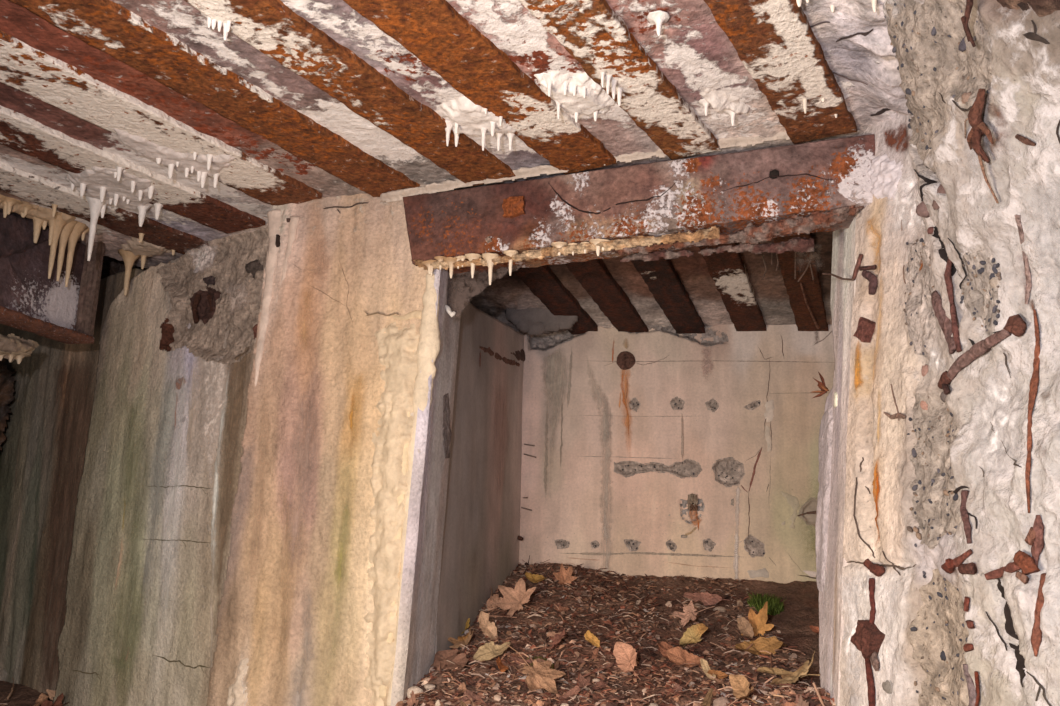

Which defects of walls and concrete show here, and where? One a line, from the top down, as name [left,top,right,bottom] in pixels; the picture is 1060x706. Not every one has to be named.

damp [438,94,516,151]
damp [528,68,625,123]
damp [380,165,569,202]
rust [550,182,676,214]
damp [0,166,175,296]
rust [931,214,1048,657]
crack [149,485,213,493]
spalling [614,457,745,506]
spalling [666,499,705,552]
crack [154,655,209,673]
rust [850,559,885,706]
crack [985,578,1051,706]